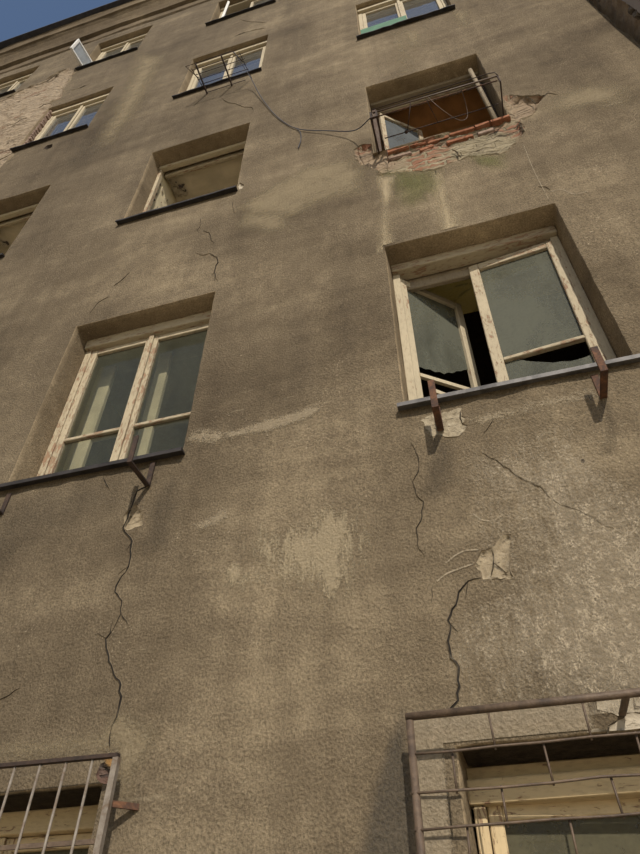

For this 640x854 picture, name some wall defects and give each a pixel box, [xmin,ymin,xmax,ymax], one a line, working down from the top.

peeling [0,68,78,167]
spalling [353,95,545,177]
crack [197,219,219,281]
peeling [421,390,597,438]
crack [411,443,425,557]
crack [482,417,621,534]
crack [98,480,152,748]
crack [431,550,506,732]
peeling [591,689,640,732]